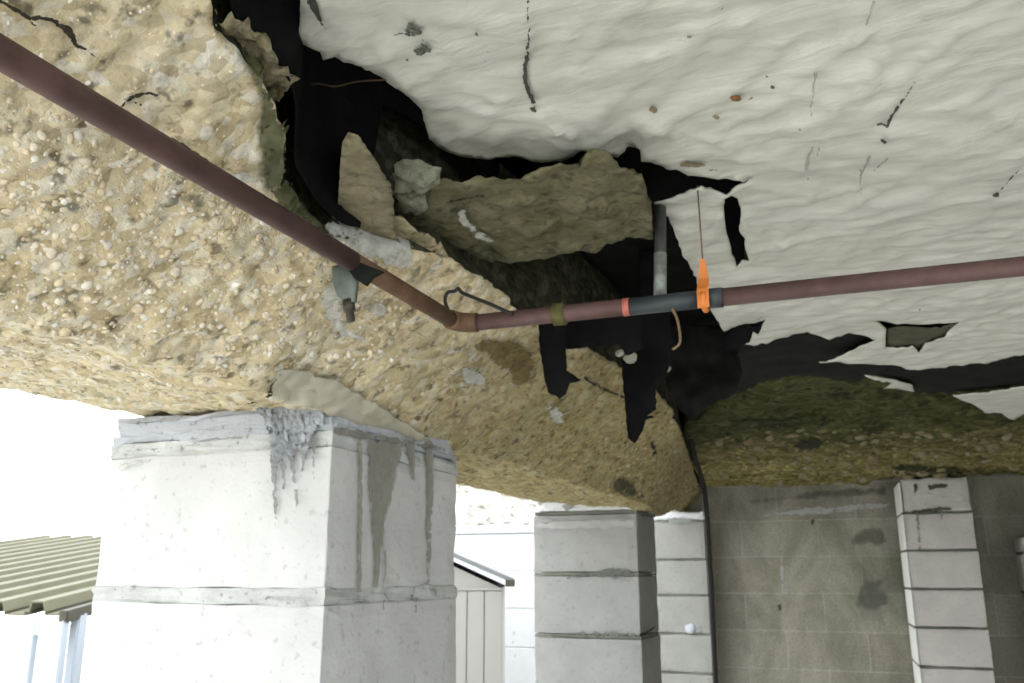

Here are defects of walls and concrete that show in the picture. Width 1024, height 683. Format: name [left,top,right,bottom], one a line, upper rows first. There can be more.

crack [0,0,95,57]
spalling [216,11,300,102]
crack [121,92,158,110]
spalling [338,132,653,266]
spalling [475,339,536,388]
damp [256,407,445,597]
damp [859,582,886,609]